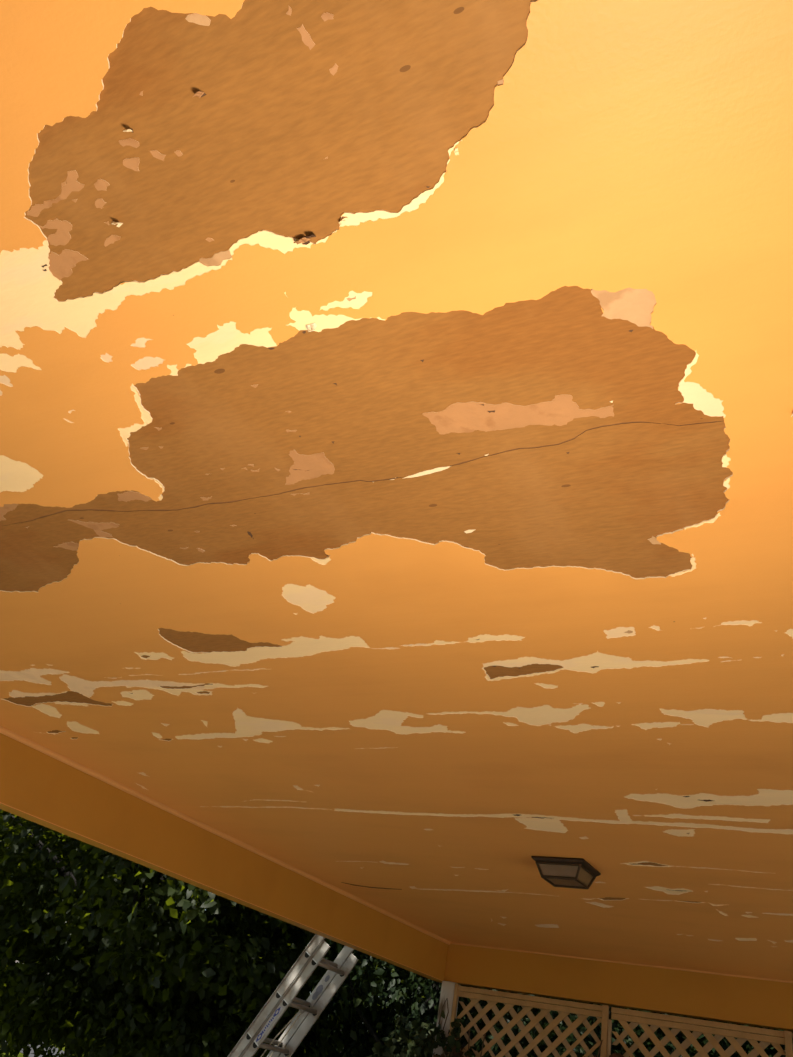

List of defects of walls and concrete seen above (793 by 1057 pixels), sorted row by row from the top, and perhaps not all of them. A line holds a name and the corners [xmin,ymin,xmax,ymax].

peeling [0,0,538,396]
peeling [0,286,733,592]
crack [450,421,721,466]
crack [3,477,402,526]
peeling [282,584,336,615]
peeling [0,628,525,739]
peeling [482,651,736,689]
peeling [152,702,619,747]
peeling [632,708,793,745]
peeling [200,785,793,837]